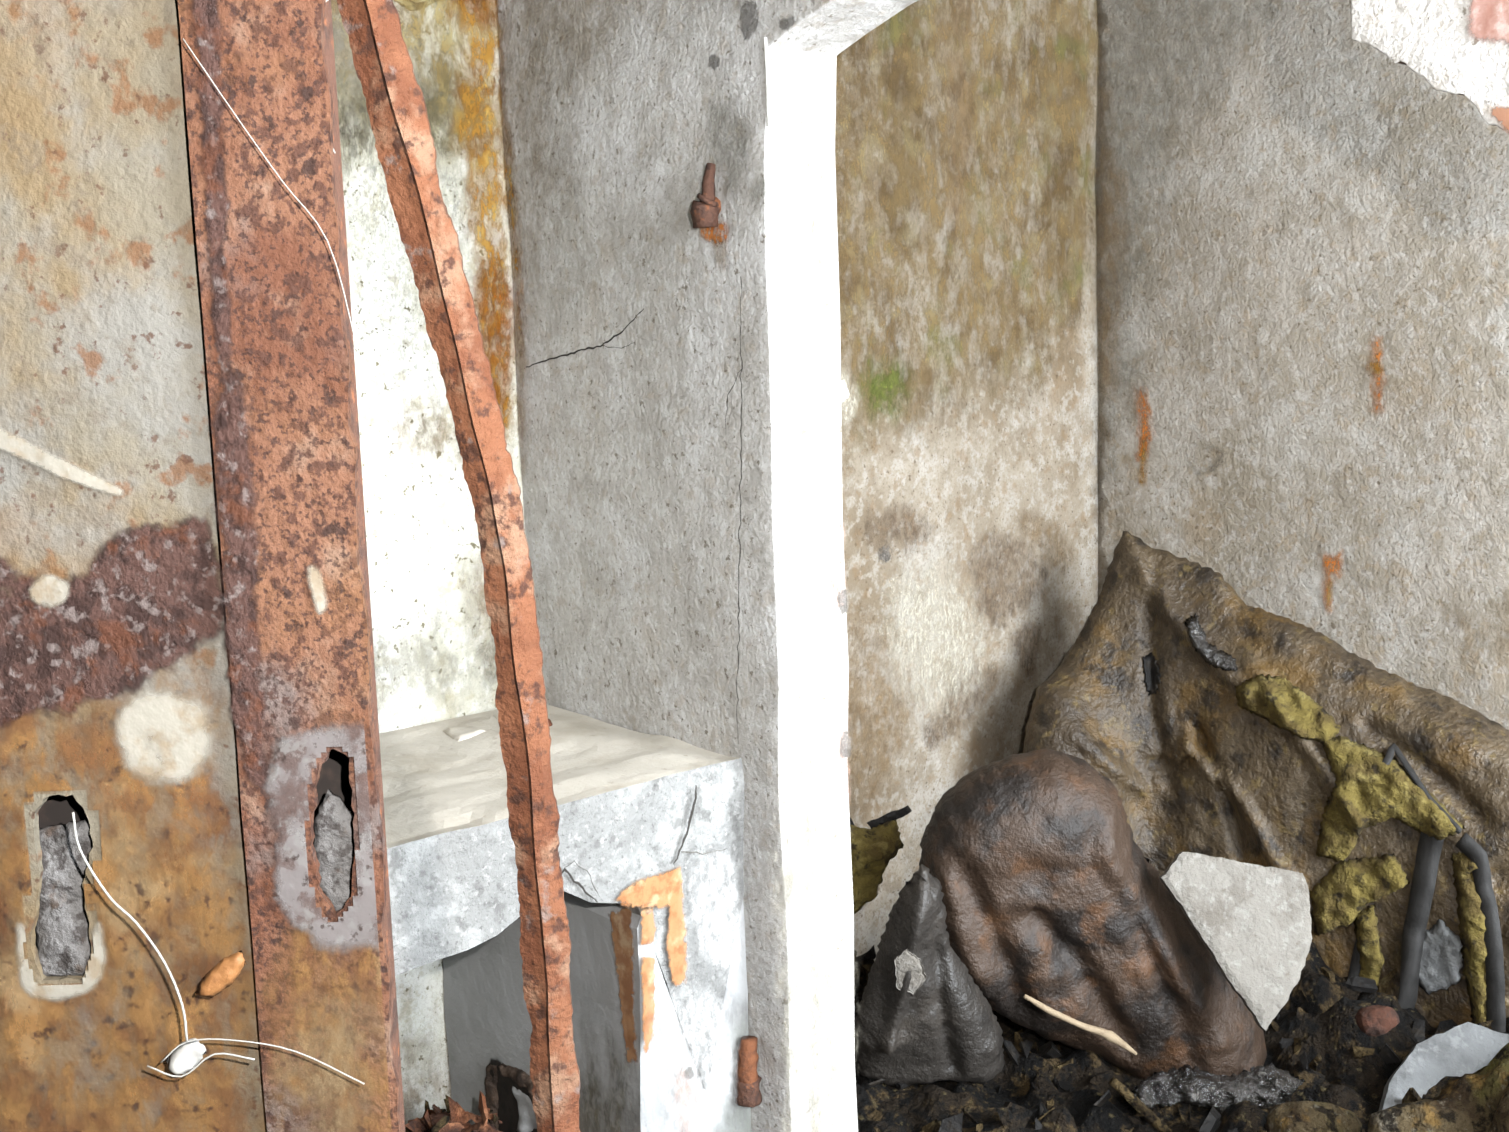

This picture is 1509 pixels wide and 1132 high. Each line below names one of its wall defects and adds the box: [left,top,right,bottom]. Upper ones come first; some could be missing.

flaking render [1492,106,1509,133]
rust [700,223,728,244]
crack [527,309,644,367]
rust [0,0,273,1132]
rust [337,0,581,1132]
crack [562,860,600,903]
rust [274,929,391,1132]